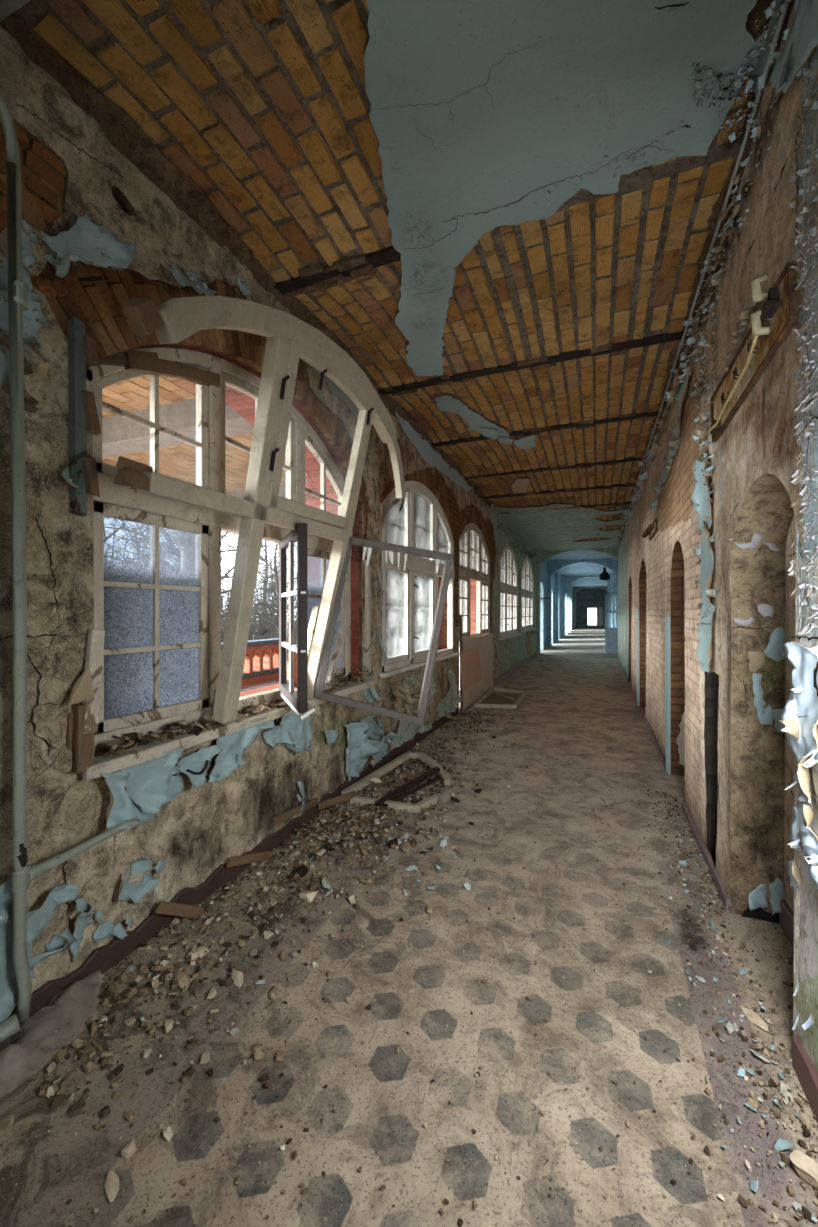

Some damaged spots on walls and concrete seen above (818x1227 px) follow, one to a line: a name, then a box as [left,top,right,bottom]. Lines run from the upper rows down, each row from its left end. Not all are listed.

crack [655,2,689,11]
peeling [0,211,136,413]
peeling [480,427,536,450]
peeling [617,0,818,924]
crack [0,518,86,789]
peeling [101,664,463,830]
peeling [0,877,134,1023]
peeling [117,858,167,903]
peeling [792,979,815,1031]